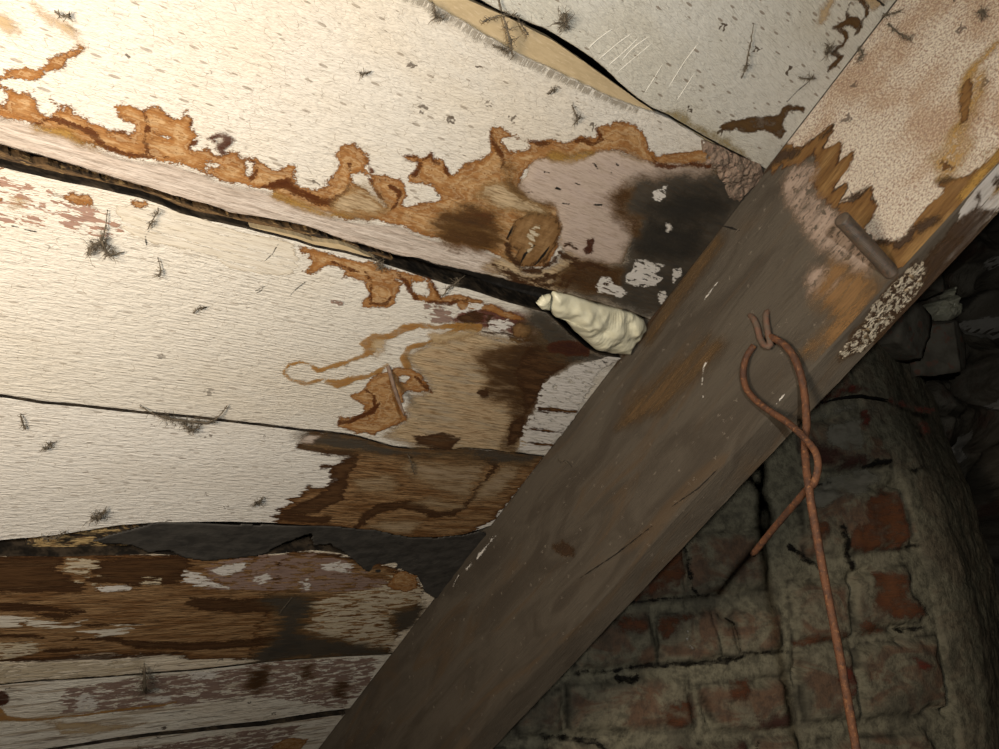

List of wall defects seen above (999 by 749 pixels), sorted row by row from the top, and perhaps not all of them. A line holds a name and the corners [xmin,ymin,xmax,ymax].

water stain [820,0,881,72]
peeling [0,119,714,304]
water stain [0,16,748,344]
water stain [666,105,878,232]
peeling [783,0,999,297]
water stain [873,42,999,343]
peeling [424,304,454,324]
water stain [270,246,625,537]
peeling [384,333,621,452]
water stain [0,550,425,684]
crack [787,543,818,569]
crack [840,523,854,571]